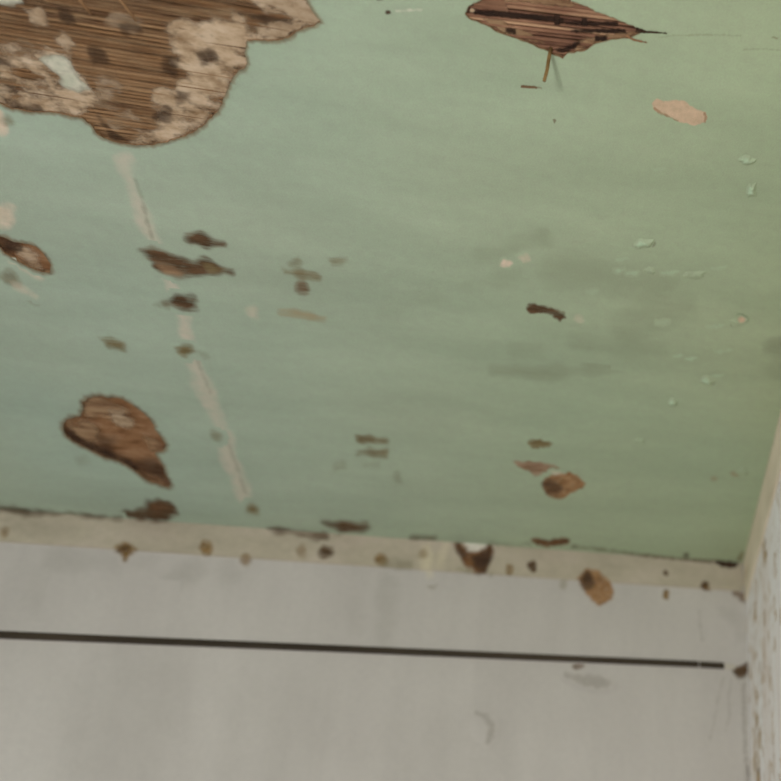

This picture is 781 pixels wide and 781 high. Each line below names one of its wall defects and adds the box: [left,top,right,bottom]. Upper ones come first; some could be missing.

flaking render [0,0,327,151]
flaking render [464,0,667,82]
peeling [651,97,709,127]
flaking render [0,194,58,286]
flaking render [130,226,242,317]
flaking render [524,300,588,326]
flaking render [55,389,185,529]
flaking render [511,437,588,501]
peeling [414,540,498,595]
flaking render [573,566,616,609]